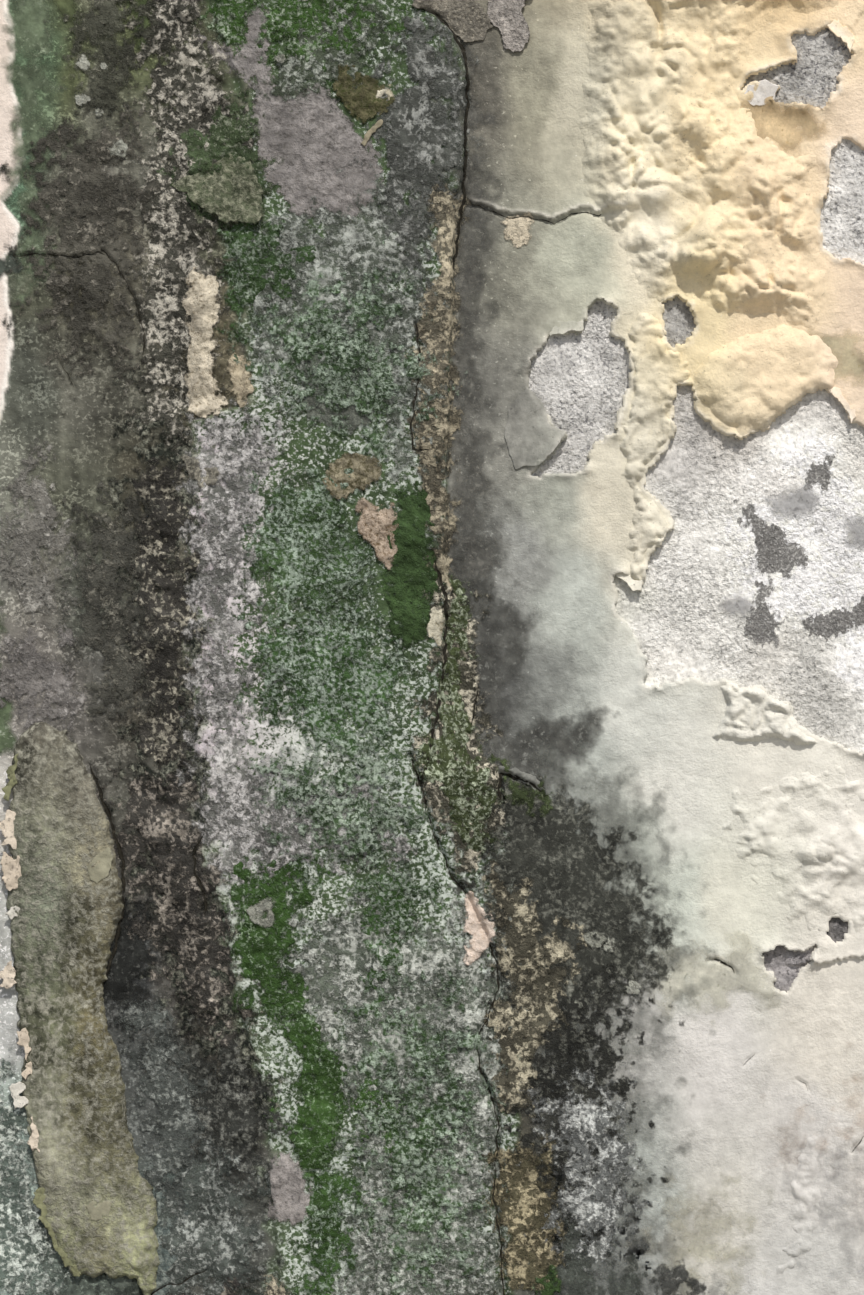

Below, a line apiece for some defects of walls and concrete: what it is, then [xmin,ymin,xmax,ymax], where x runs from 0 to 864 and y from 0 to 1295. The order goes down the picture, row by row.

crack [424,9,601,269]
peeling [740,19,855,108]
peeling [820,139,864,264]
crack [12,251,145,360]
crack [410,322,431,451]
peeling [504,301,631,478]
peeling [613,385,864,753]
crack [410,560,467,894]
crack [498,773,544,805]
leakage [432,97,774,1295]
peeling [762,918,848,993]
crack [477,943,505,1295]